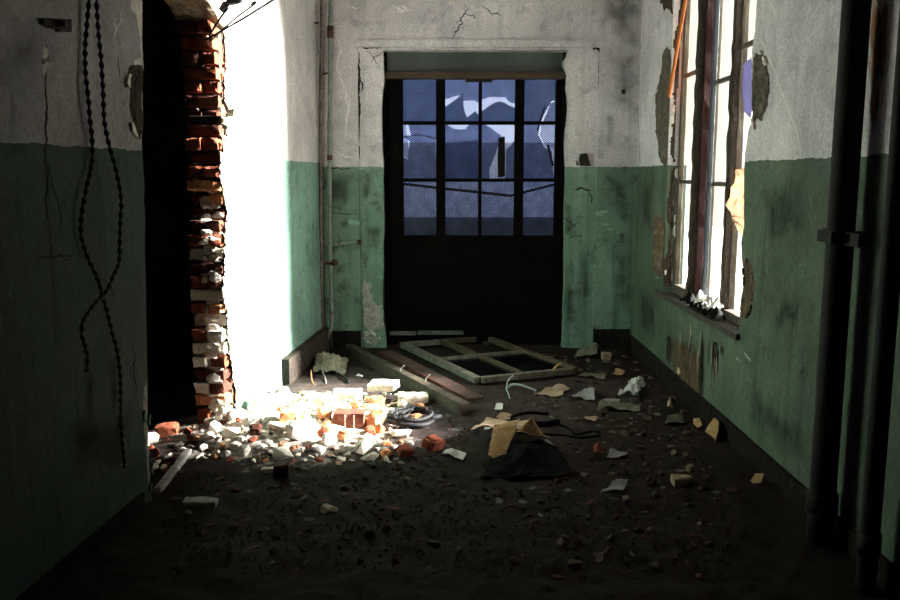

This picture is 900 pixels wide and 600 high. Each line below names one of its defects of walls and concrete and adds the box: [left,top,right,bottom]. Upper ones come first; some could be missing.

crack [454,5,501,35]
spalling [125,0,143,139]
crack [323,48,382,170]
spalling [654,0,683,287]
spalling [750,50,770,130]
peeling [361,280,384,346]
spalling [740,257,755,318]